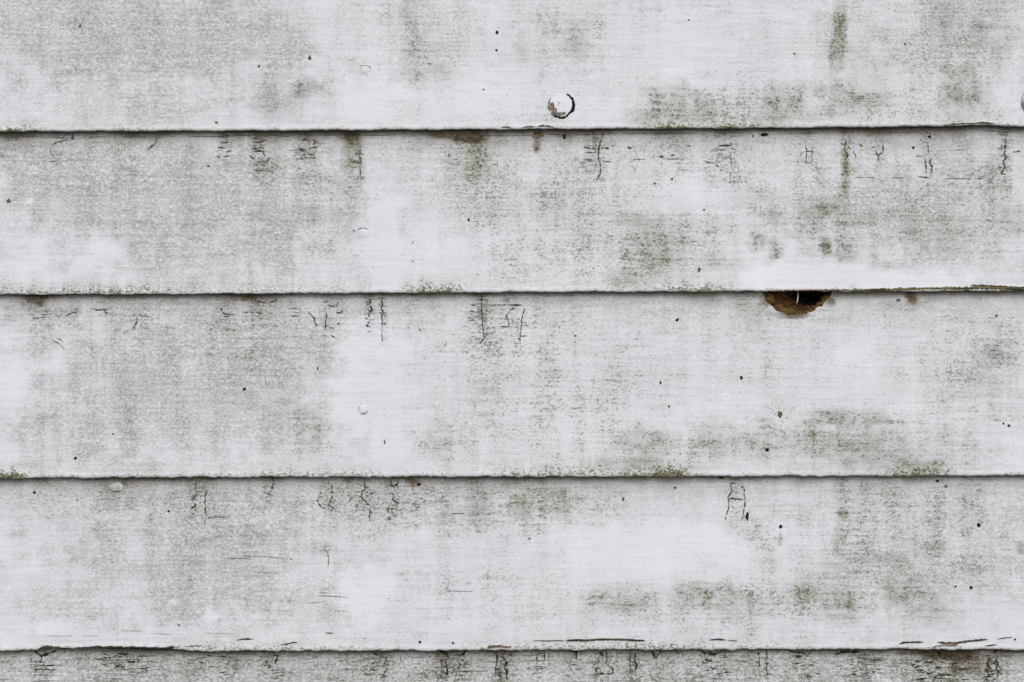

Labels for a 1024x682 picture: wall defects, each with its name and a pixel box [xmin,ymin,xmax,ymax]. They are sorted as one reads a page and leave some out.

mould [644,81,712,124]
crack [786,133,813,163]
crack [841,130,1019,179]
mould [633,224,679,267]
crack [469,298,528,344]
crack [190,482,229,523]
crack [317,479,423,521]
crack [725,483,746,519]